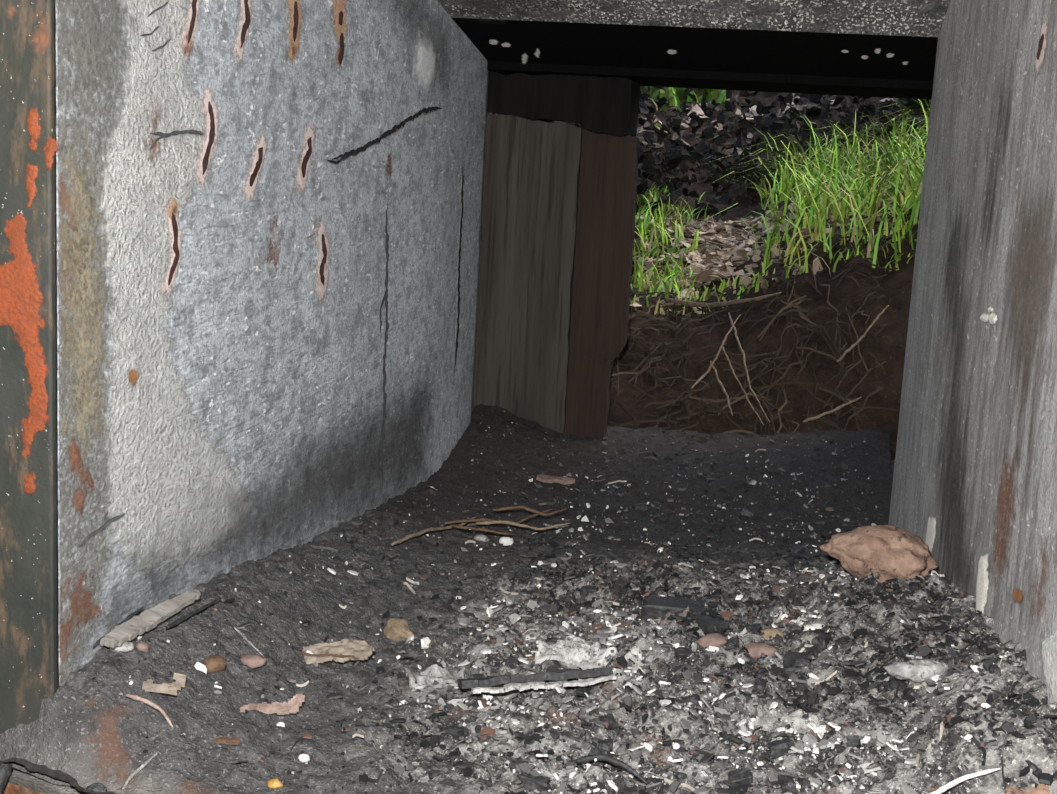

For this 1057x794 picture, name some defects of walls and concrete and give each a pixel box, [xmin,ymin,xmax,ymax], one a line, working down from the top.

crack [150,130,206,149]
crack [327,106,442,164]
crack [3,758,118,794]